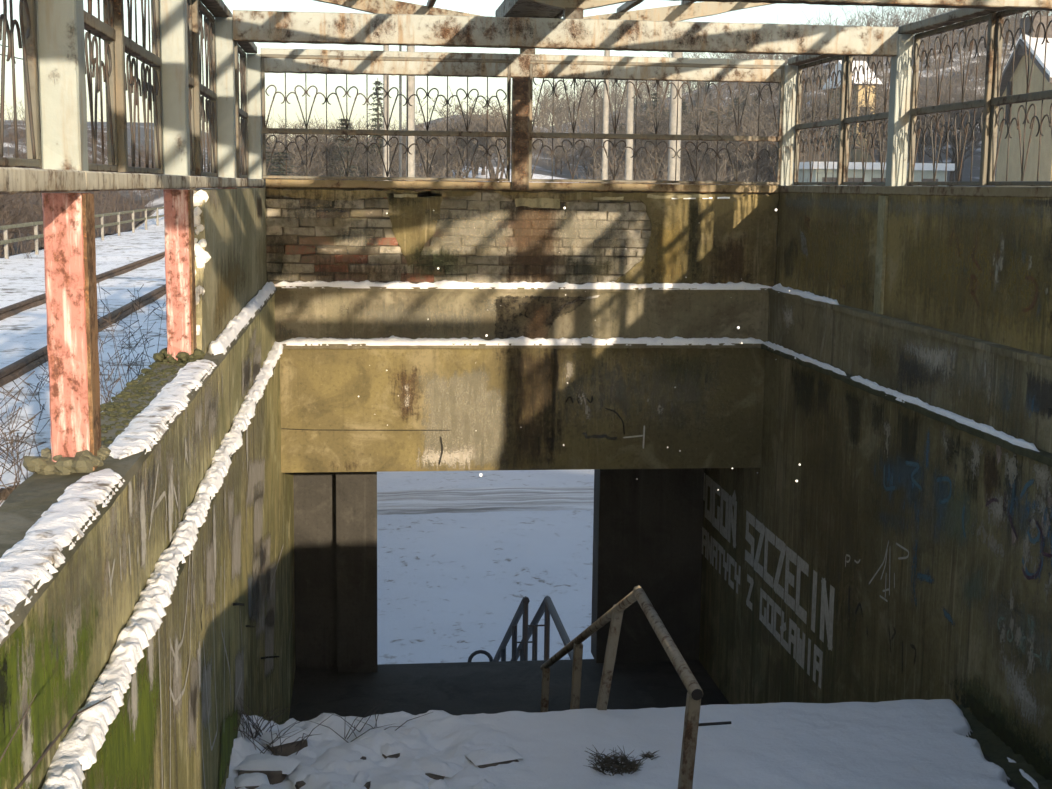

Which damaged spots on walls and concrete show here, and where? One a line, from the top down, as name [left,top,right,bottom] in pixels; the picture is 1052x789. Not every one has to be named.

rust [435,21,472,41]
rust [620,23,639,38]
rust [675,30,705,47]
spalling [266,188,709,283]
spalling [495,295,588,339]
peeling [968,438,1052,724]